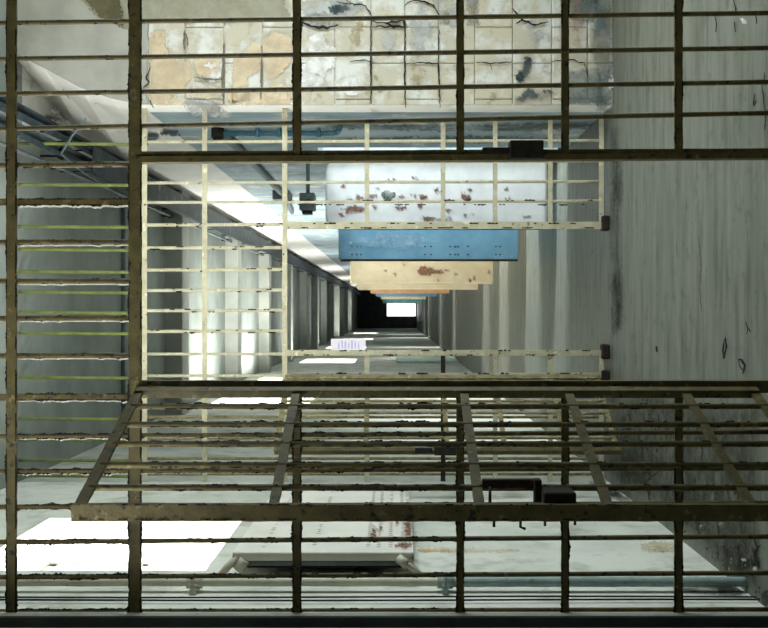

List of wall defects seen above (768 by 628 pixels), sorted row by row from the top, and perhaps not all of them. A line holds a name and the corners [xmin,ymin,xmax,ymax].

crack [301,22,338,30]
crack [513,8,548,26]
peeling [140,0,363,147]
crack [337,0,441,108]
leakage [515,56,551,101]
rust [339,188,379,217]
rust [418,266,447,281]
crack [722,337,746,374]
peeling [4,324,129,529]
peeling [226,519,311,554]
peeling [5,519,169,613]
peeling [428,519,466,613]